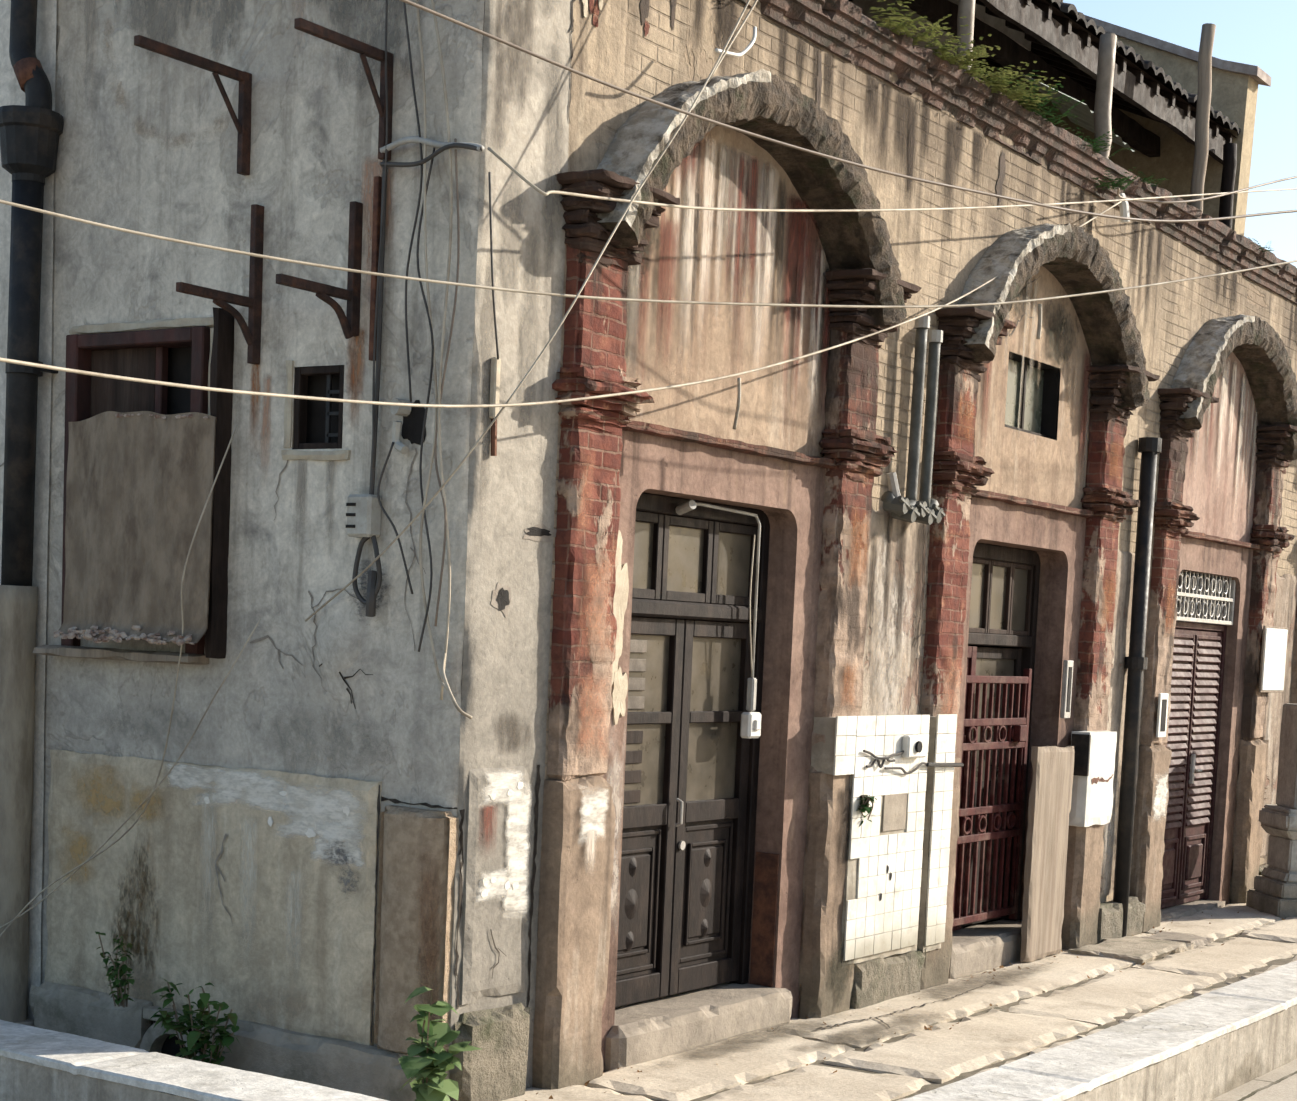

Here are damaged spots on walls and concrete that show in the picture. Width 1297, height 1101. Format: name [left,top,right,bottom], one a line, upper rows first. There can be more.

spalling [581,0,603,27]
damp [626,143,832,381]
crack [250,589,373,709]
spalling [611,530,629,725]
damp [869,518,926,716]
damp [113,850,153,968]
peeling [169,765,362,866]
peeling [480,773,530,910]